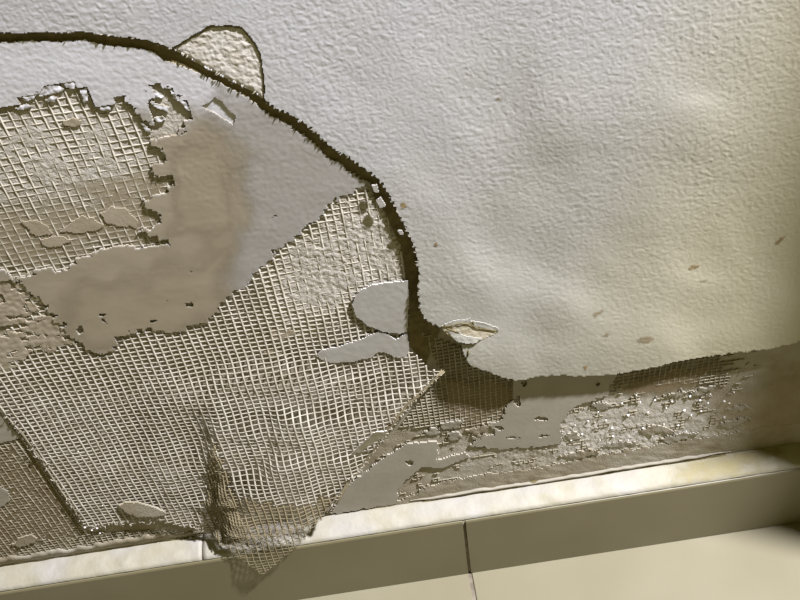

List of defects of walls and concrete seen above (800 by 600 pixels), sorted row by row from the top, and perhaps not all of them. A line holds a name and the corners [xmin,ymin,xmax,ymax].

flaking render [0,27,370,238]
crack [0,25,440,365]
flaking render [0,206,170,376]
flaking render [352,280,409,334]
peeling [441,318,499,357]
flaking render [0,411,20,443]
flaking render [321,375,800,516]
flaking render [119,501,166,517]
flaking render [11,534,37,547]